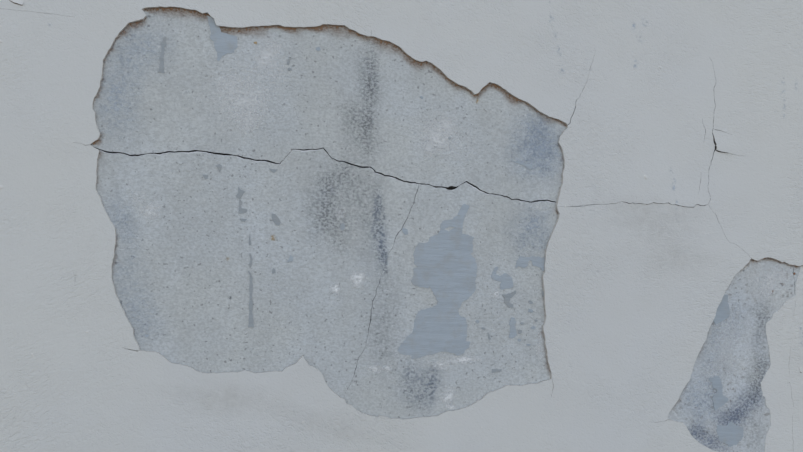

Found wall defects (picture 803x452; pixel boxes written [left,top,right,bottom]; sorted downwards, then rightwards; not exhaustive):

peeling [90,6,568,420]
crack [80,71,739,393]
peeling [667,257,803,452]